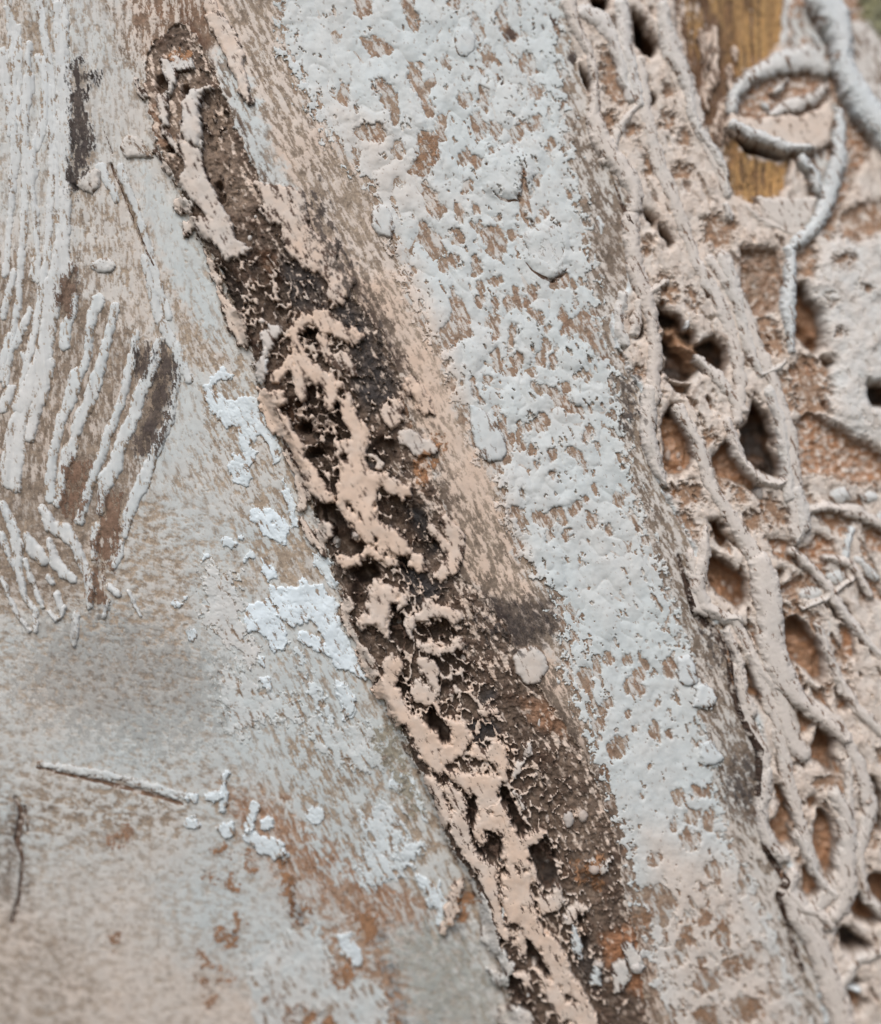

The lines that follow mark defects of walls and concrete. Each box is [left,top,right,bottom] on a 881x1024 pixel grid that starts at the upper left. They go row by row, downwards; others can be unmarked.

spalling [203,0,255,106]
spalling [133,23,650,1024]
spalling [272,0,881,1024]